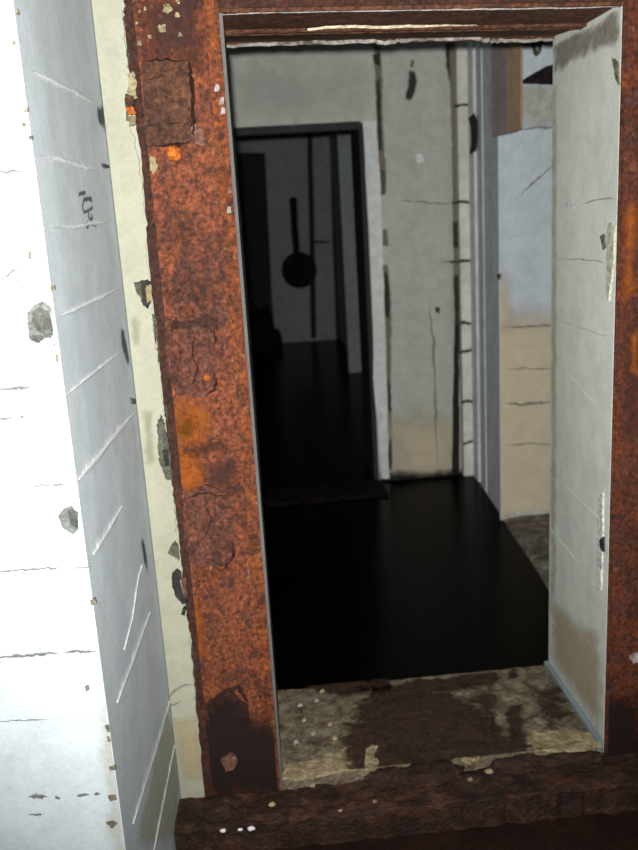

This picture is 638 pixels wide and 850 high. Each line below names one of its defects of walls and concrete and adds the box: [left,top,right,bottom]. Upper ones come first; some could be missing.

corrosion [146,0,199,62]
corrosion [149,156,158,175]
corrosion [191,124,206,146]
corrosion [625,207,636,292]
spalling [27,301,59,363]
corrosion [169,300,219,330]
peeling [119,0,202,779]
crack [429,303,460,472]
corrosion [176,406,218,488]
spalling [58,505,79,534]
corrosion [194,601,204,656]
corrosion [221,752,238,772]